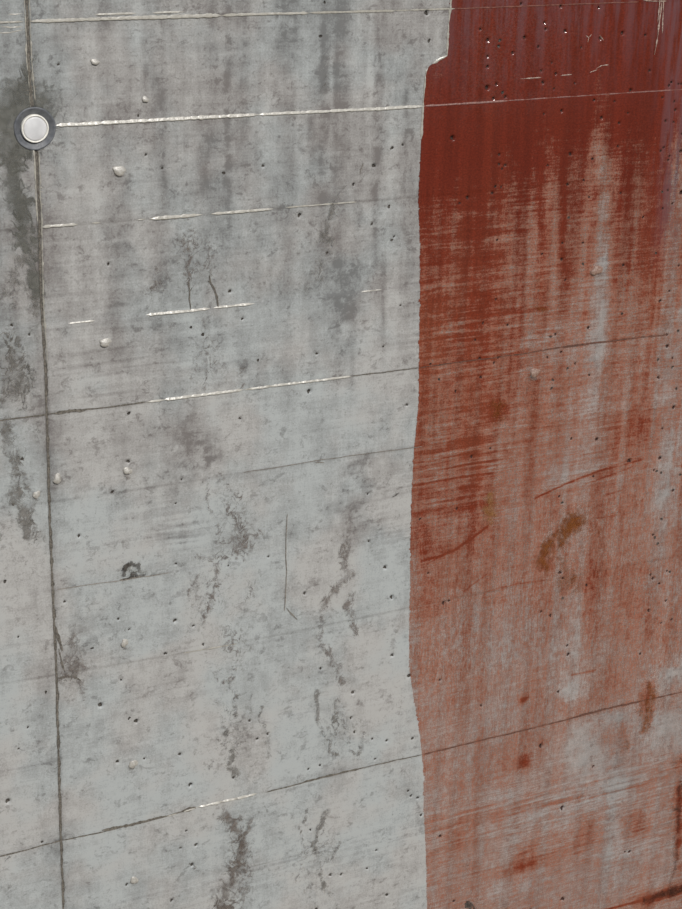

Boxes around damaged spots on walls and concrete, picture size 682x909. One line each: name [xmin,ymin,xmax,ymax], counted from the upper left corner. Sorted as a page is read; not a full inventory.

damp [0,59,56,175]
damp [14,186,43,317]
damp [0,332,33,410]
damp [8,455,39,539]